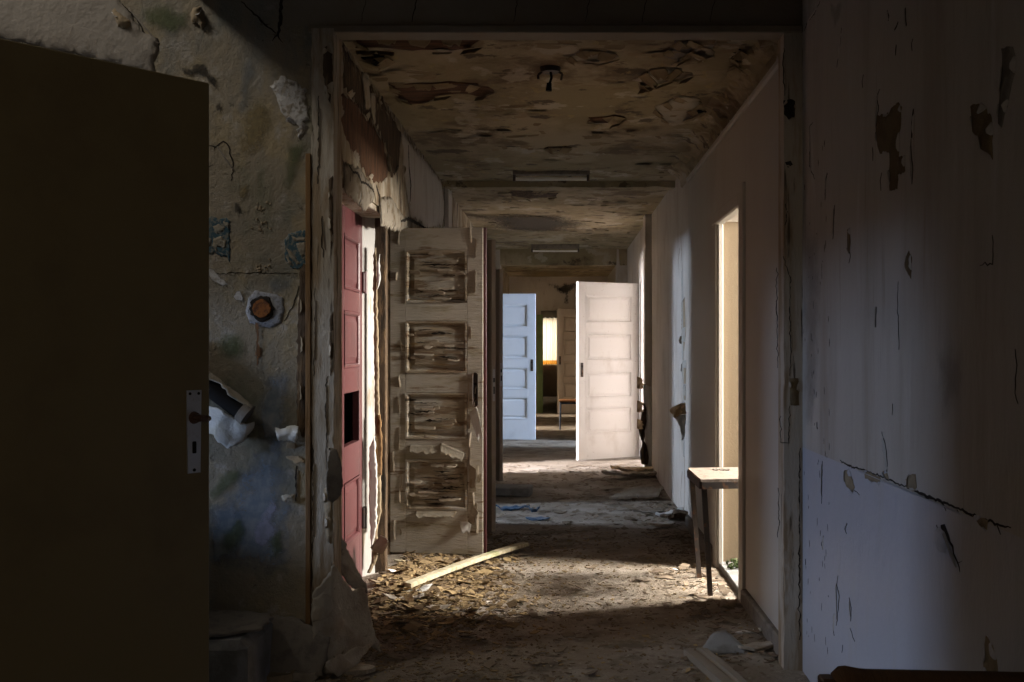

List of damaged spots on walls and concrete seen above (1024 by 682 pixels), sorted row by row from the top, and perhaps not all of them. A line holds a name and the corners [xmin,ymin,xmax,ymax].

peeling [0,0,159,72]
crack [209,141,235,181]
crack [241,0,283,43]
peeling [270,76,310,138]
peeling [322,40,495,183]
peeling [563,50,620,66]
peeling [633,40,717,125]
peeling [874,102,905,191]
peeling [970,46,1016,160]
crack [777,404,1011,651]